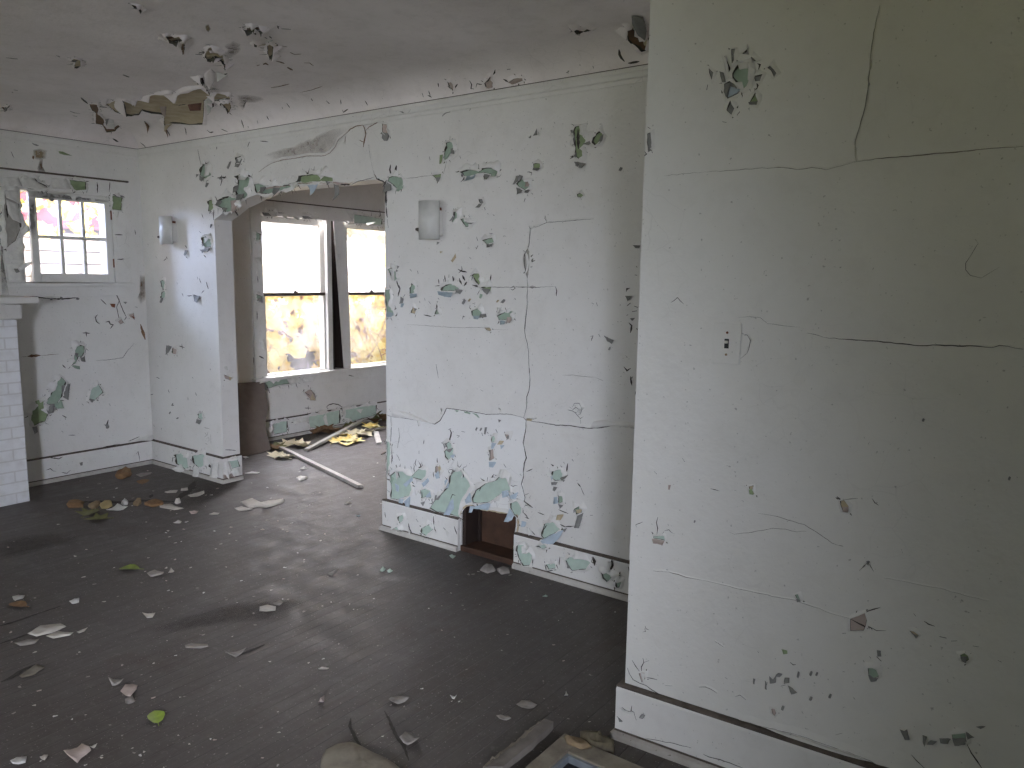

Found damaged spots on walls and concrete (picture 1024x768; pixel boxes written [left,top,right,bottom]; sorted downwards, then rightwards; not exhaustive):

flaking render [81,33,235,145]
peeling [707,44,781,123]
crack [664,6,1023,176]
peeling [570,123,607,168]
peeling [0,174,124,281]
peeling [184,144,351,259]
crack [527,217,594,248]
peeling [24,332,89,434]
peeling [384,242,516,333]
crack [388,280,635,502]
crack [738,315,1024,358]
peeling [384,410,629,590]